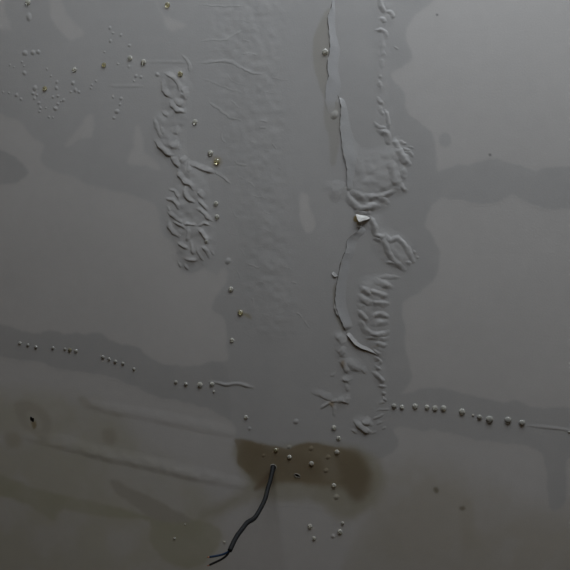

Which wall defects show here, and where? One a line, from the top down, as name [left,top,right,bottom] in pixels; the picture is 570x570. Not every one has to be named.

leakage [0,0,400,570]
peeling [332,214,376,354]
leakage [337,441,570,570]
leakage [346,0,570,512]